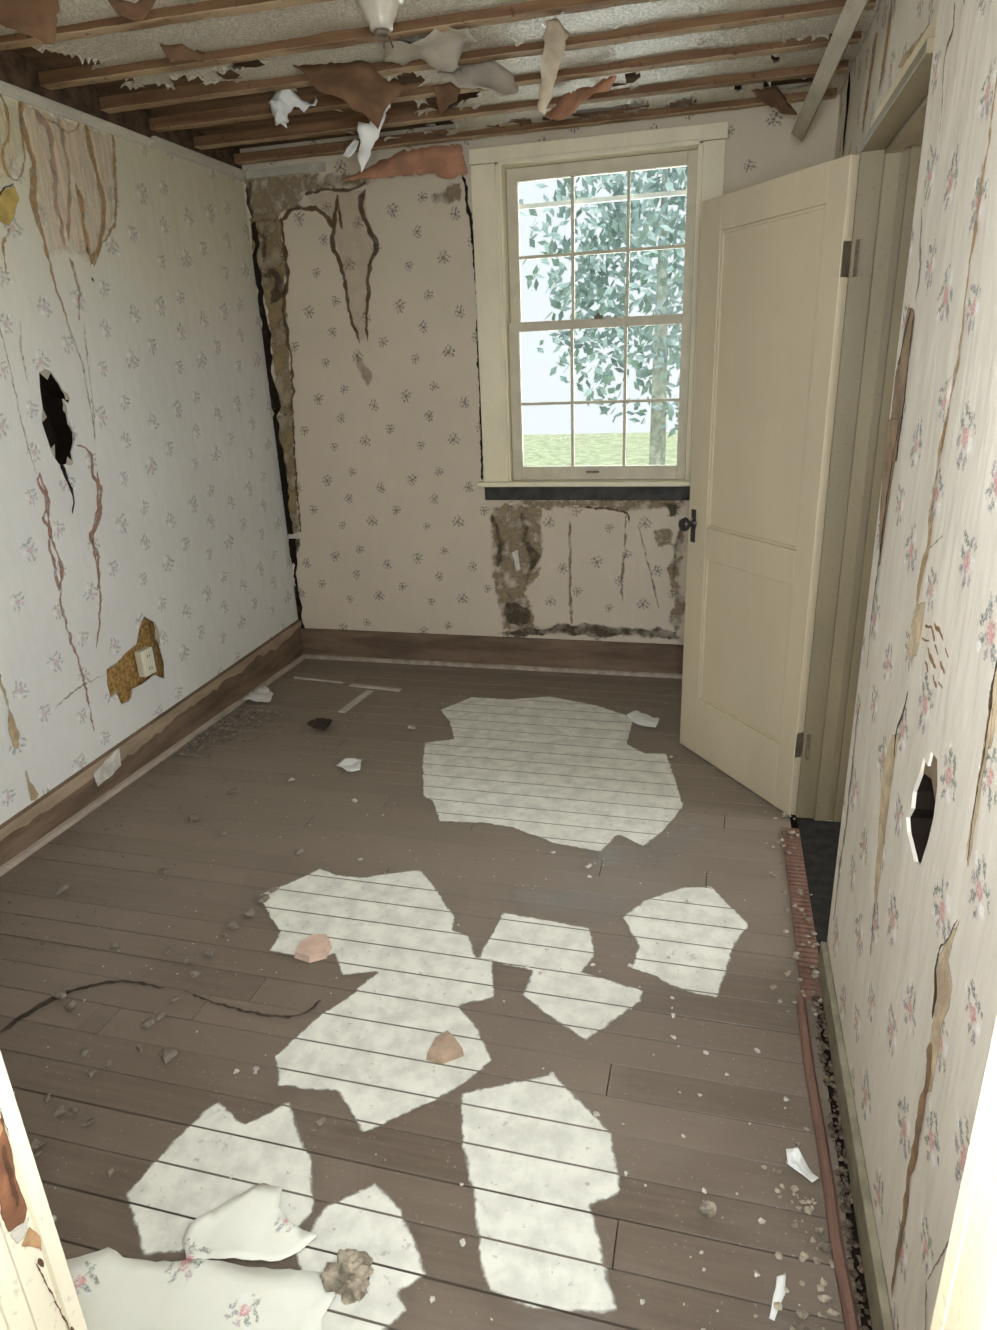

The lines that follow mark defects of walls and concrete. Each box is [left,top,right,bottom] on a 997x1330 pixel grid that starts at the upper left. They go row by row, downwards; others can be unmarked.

damp [0,94,117,320]
spalling [39,369,76,465]
spalling [107,617,164,704]
damp [0,674,19,748]
damp [26,771,39,800]
spalling [910,754,937,863]